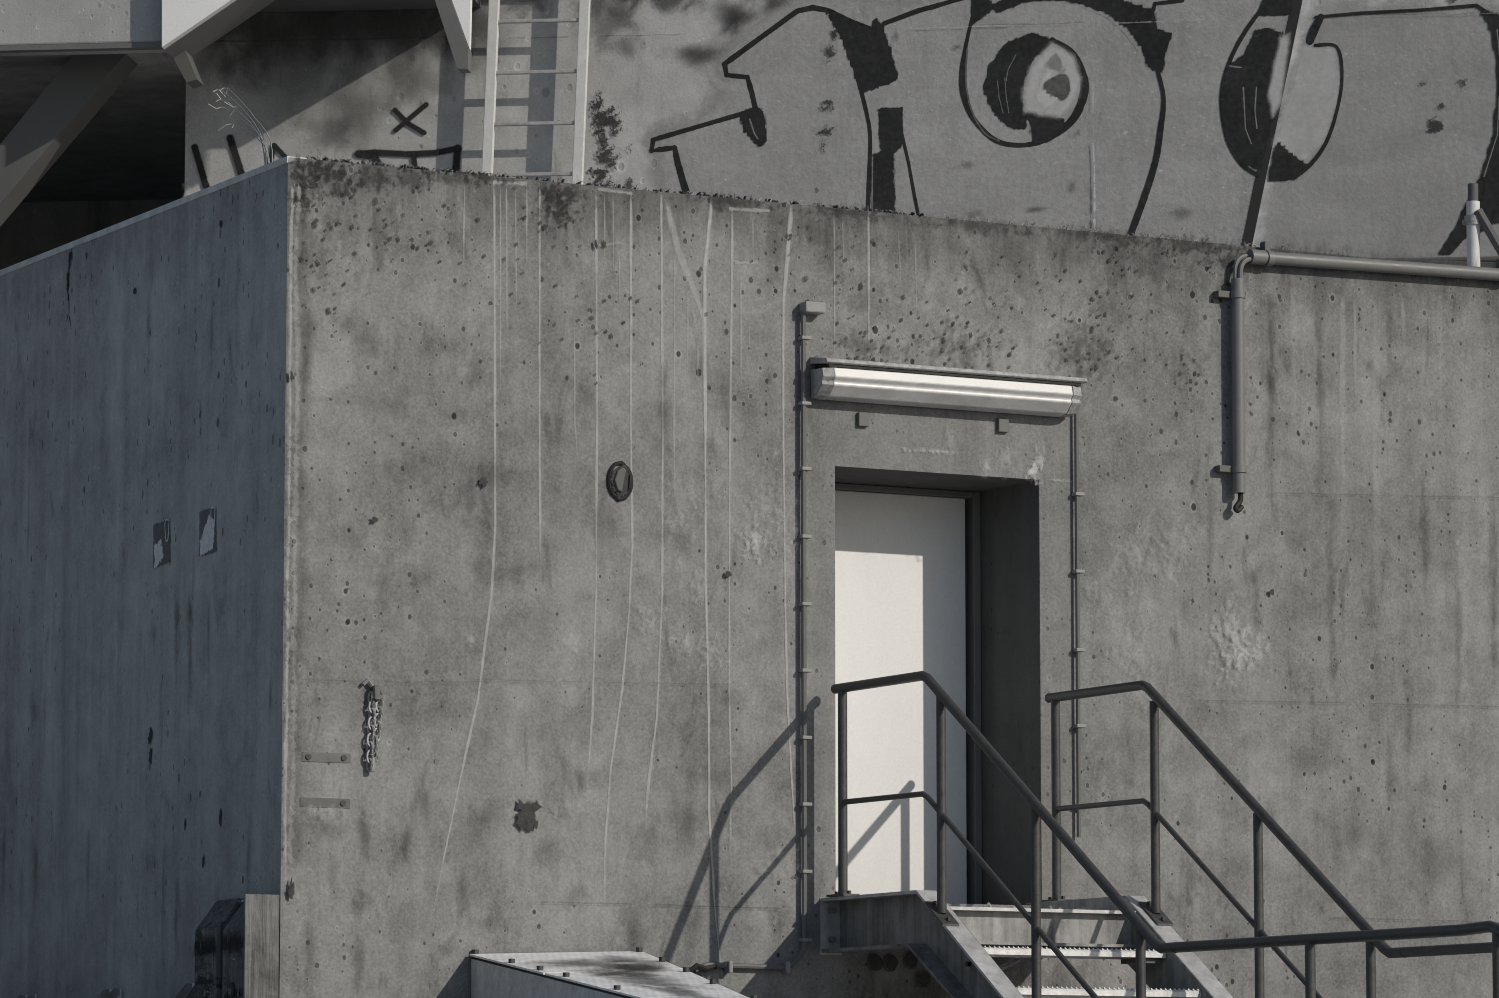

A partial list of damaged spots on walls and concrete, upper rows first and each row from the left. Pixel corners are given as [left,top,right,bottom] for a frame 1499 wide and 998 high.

crack [65,252,73,325]